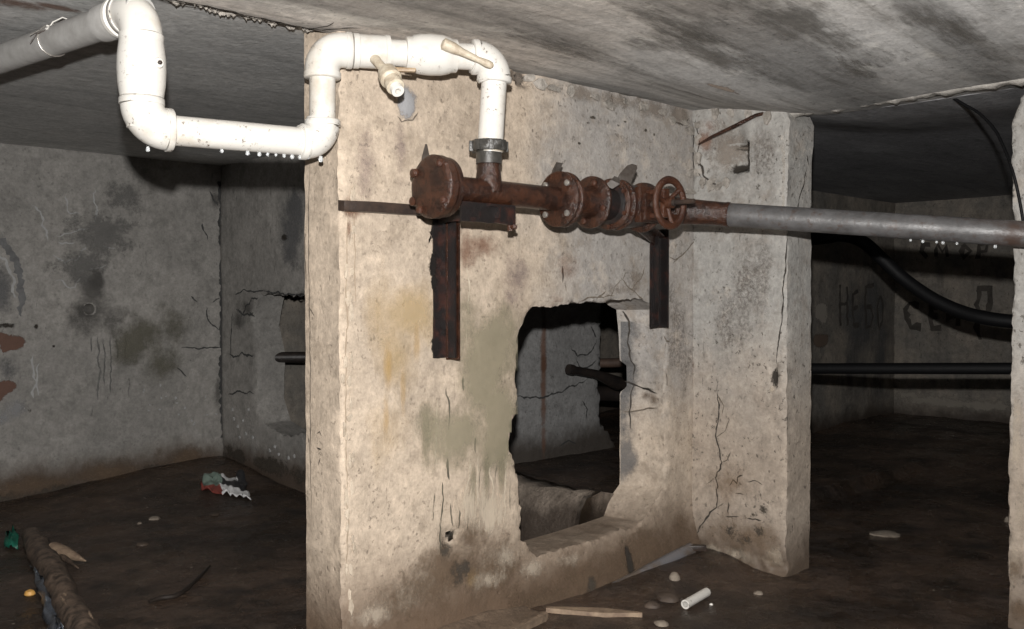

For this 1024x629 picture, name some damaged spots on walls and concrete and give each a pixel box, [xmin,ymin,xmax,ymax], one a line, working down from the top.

damp [633,11,732,68]
damp [759,8,850,48]
damp [56,216,133,322]
damp [90,320,195,425]
crack [178,165,314,519]
damp [365,247,515,621]
crack [562,266,670,428]
crack [697,381,761,533]
crack [770,239,788,391]